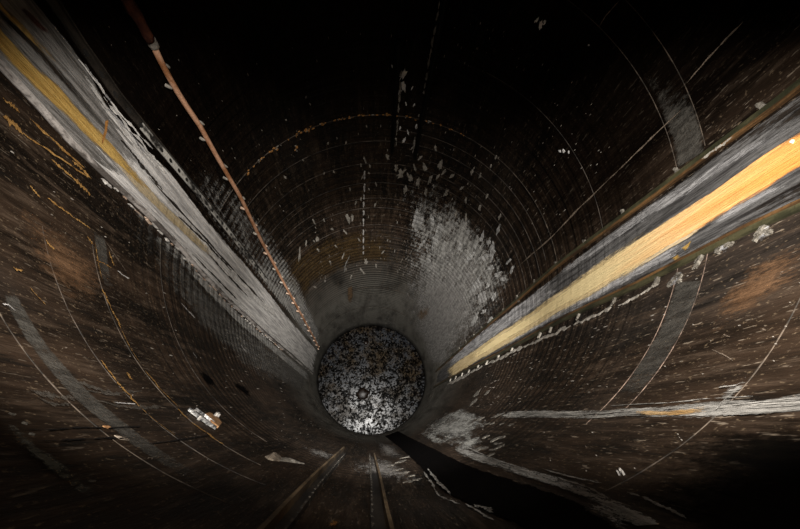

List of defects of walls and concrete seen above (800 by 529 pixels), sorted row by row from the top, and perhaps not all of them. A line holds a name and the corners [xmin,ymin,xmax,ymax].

corrosion [3,98,90,196]
corrosion [288,113,464,151]
leakage [403,96,800,384]